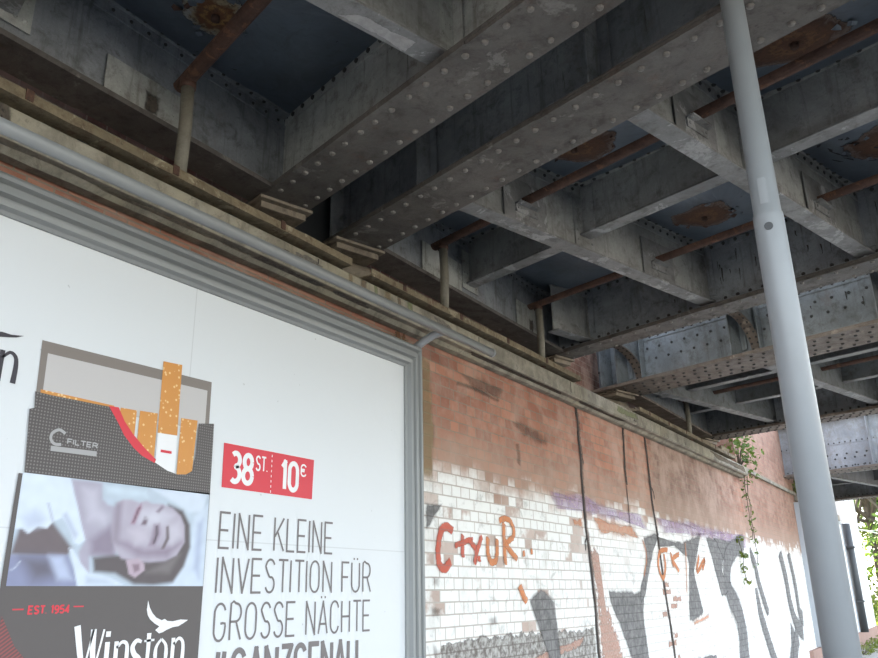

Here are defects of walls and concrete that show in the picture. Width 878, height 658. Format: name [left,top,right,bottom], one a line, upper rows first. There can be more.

rust [171,0,243,36]
rust [840,125,878,160]
crack [575,408,601,658]
crack [622,428,676,658]